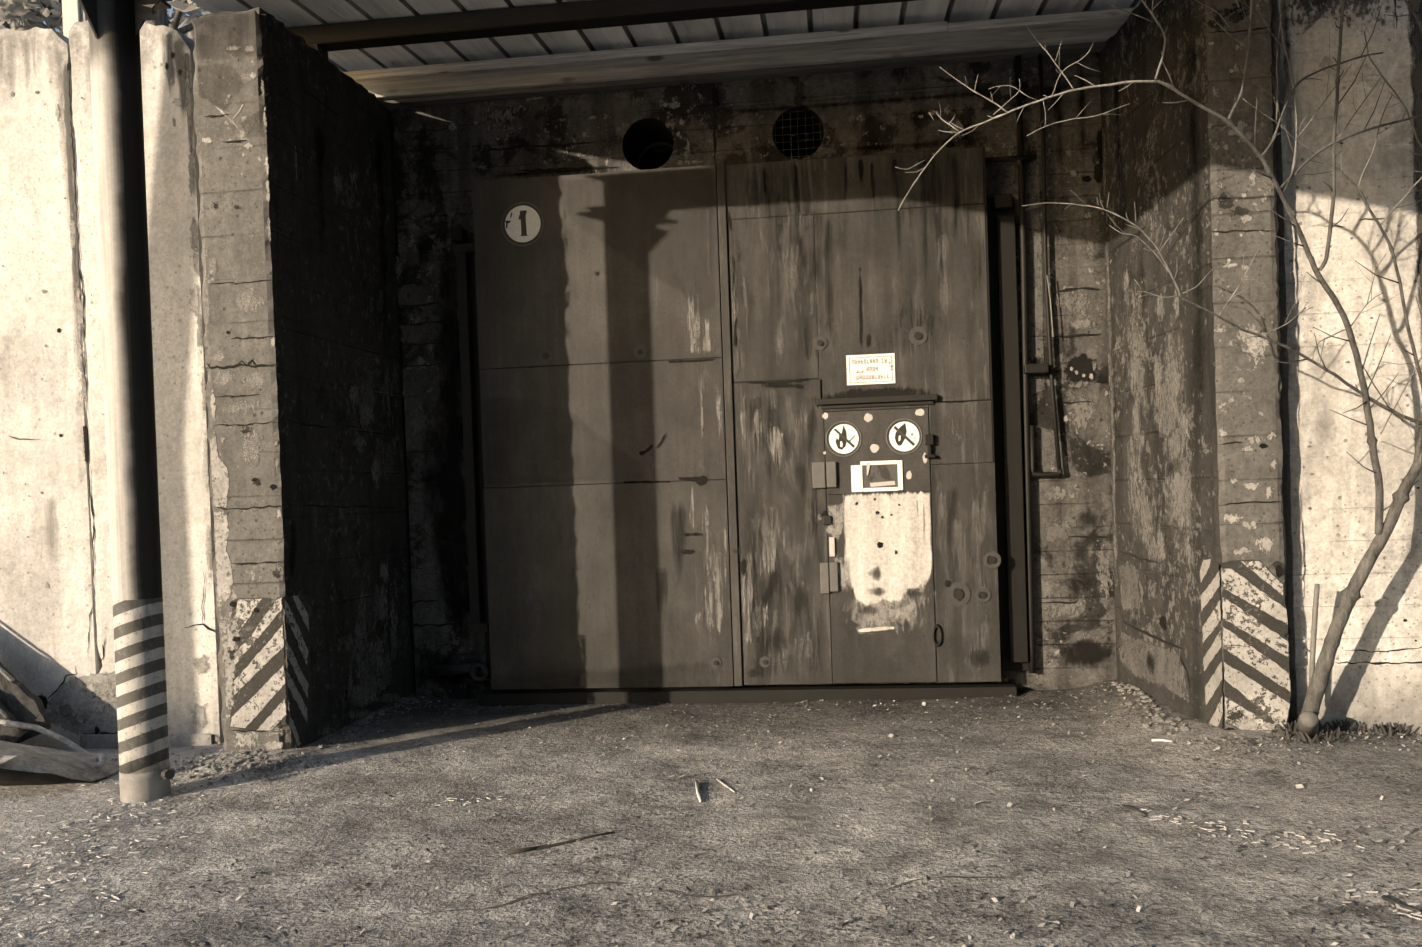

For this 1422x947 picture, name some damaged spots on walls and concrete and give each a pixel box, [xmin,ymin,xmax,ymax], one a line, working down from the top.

crack [38,459,115,701]
crack [67,62,88,422]
spalling [165,52,212,196]
peeling [189,219,284,751]
peeling [682,284,711,352]
peeling [699,370,722,436]
peeling [732,278,748,365]
peeling [690,387,986,667]
peeling [938,236,949,310]
water stain [1188,46,1205,389]
water stain [1281,0,1422,328]